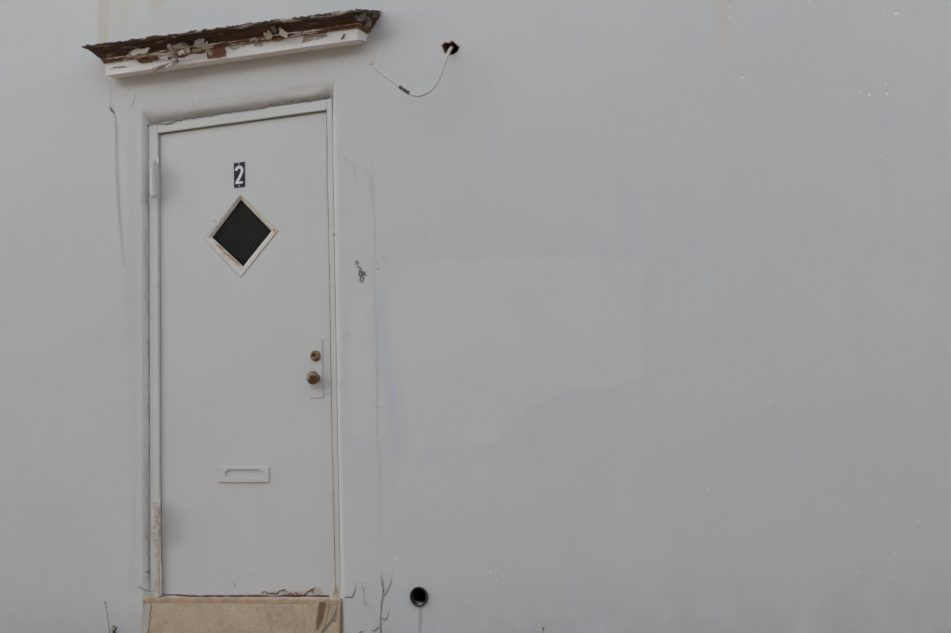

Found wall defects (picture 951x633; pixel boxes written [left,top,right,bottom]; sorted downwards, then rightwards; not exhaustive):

peeling [110,26,327,72]